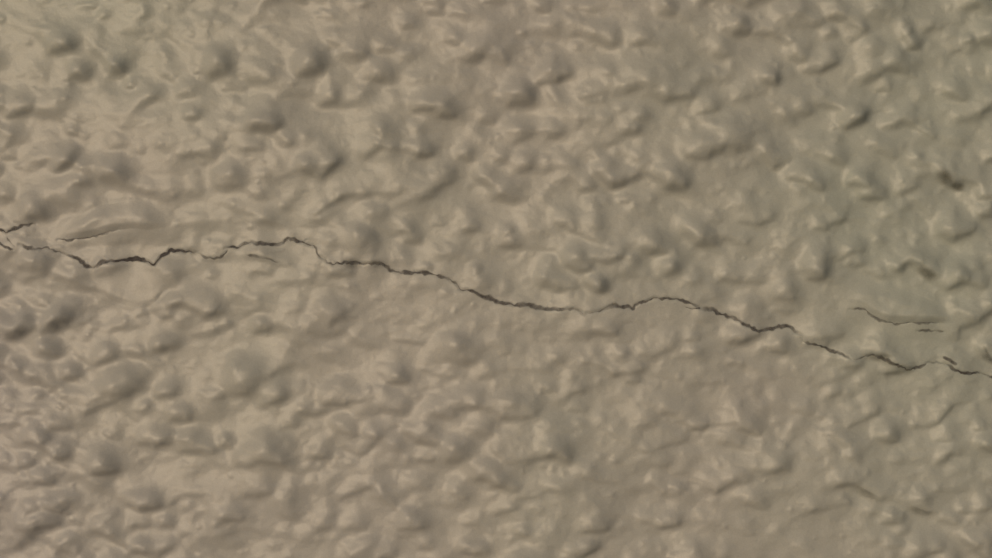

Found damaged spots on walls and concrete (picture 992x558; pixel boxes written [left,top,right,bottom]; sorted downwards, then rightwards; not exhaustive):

crack [0,224,31,250]
crack [55,238,309,268]
crack [384,265,561,310]
crack [599,297,790,332]
crack [812,344,844,360]
crack [944,357,992,378]